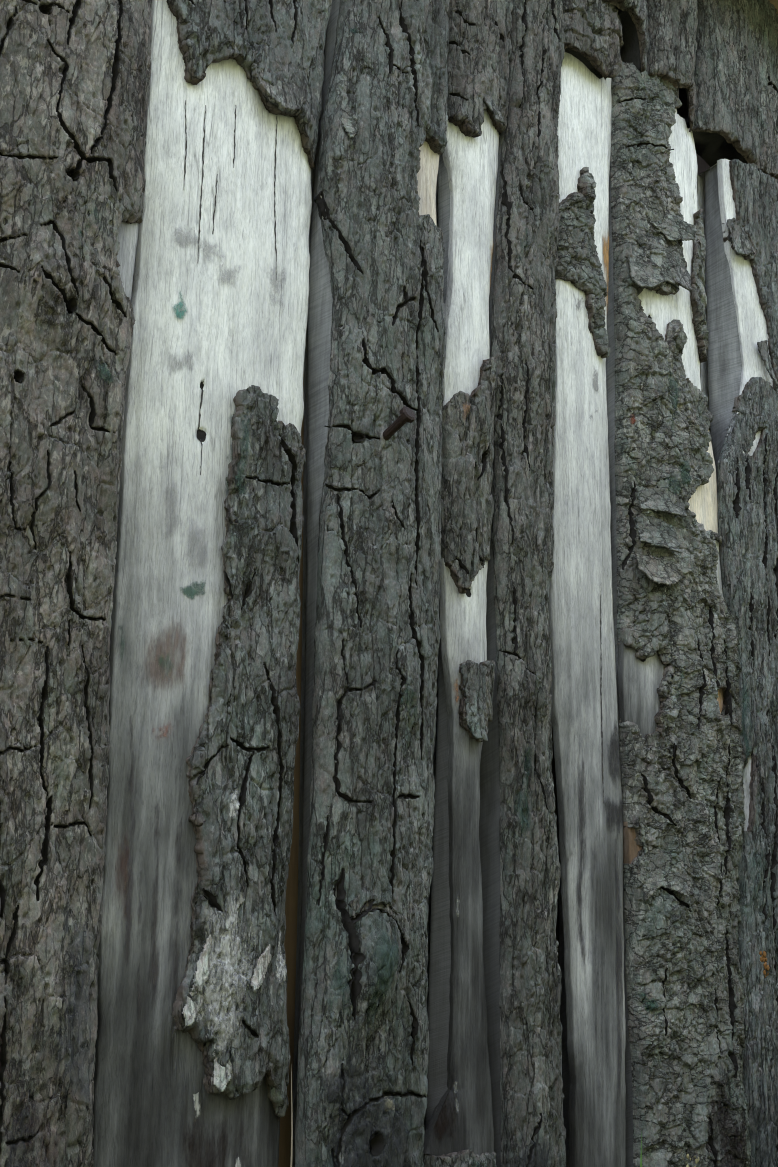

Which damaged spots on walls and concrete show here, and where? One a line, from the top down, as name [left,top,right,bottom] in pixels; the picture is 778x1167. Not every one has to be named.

crack [0,0,123,191]
crack [0,220,127,355]
crack [184,100,236,257]
peeling [417,91,505,406]
peeling [557,52,612,330]
damp [125,810,178,992]
peeling [92,0,312,1167]
crack [245,435,299,561]
crack [318,240,439,1020]
peeling [423,558,494,1158]
peeling [548,279,689,1167]
damp [184,1092,241,1167]